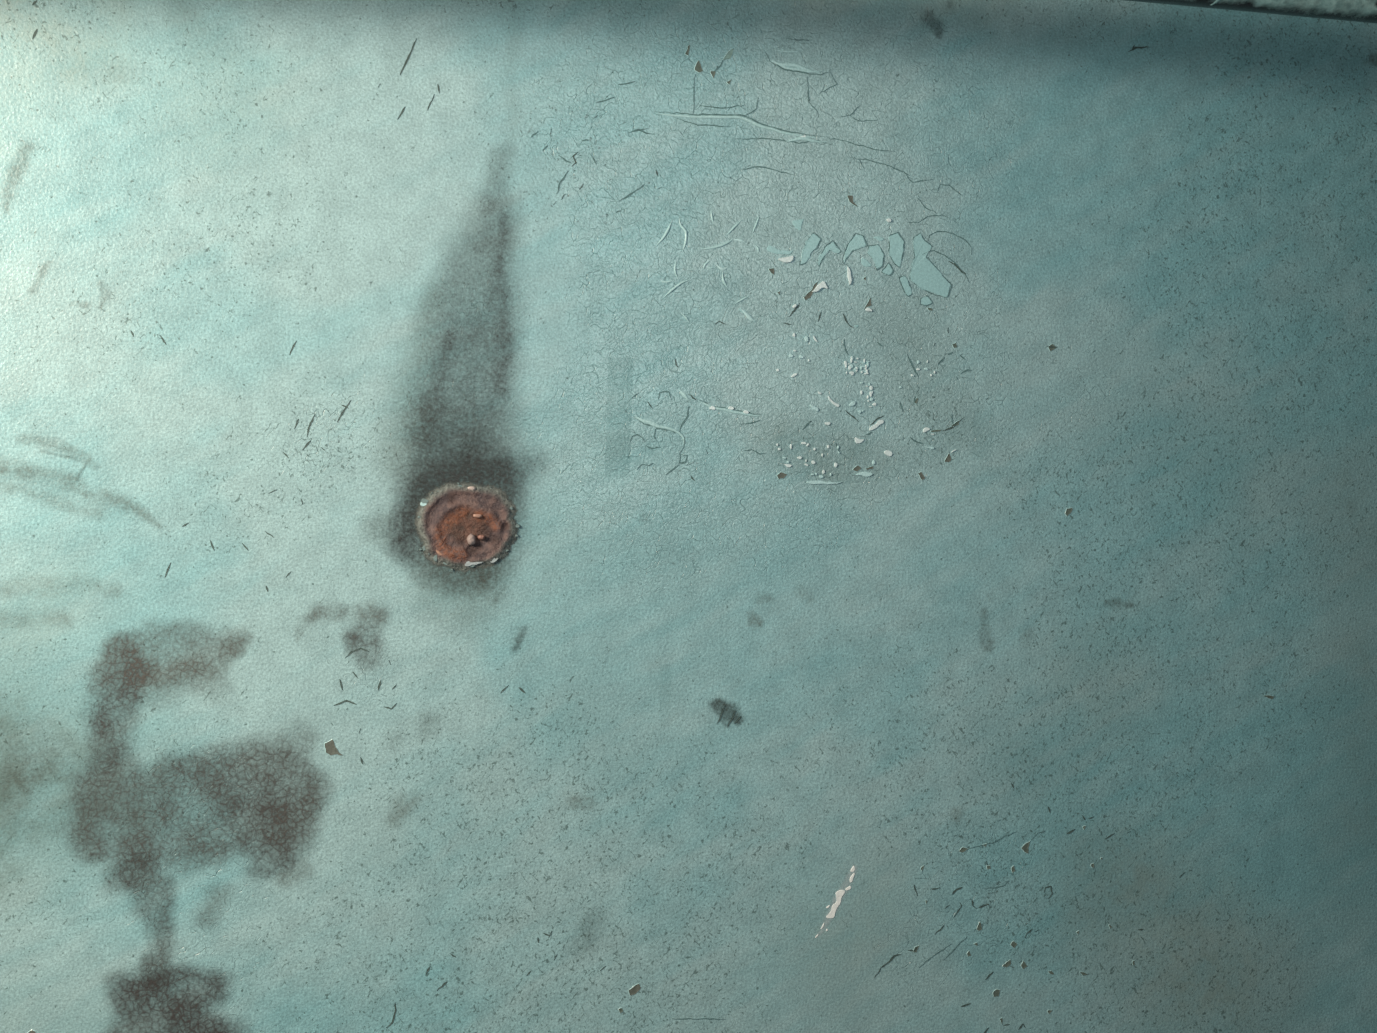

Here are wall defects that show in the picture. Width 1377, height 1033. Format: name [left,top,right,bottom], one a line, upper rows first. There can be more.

crack [531,81,635,205]
crack [629,38,972,282]
peeling [655,217,952,377]
leakage [392,214,523,589]
crack [630,359,764,481]
peeling [776,297,893,484]
peeling [899,330,970,463]
corrosion [414,482,520,572]
peeling [815,866,855,938]